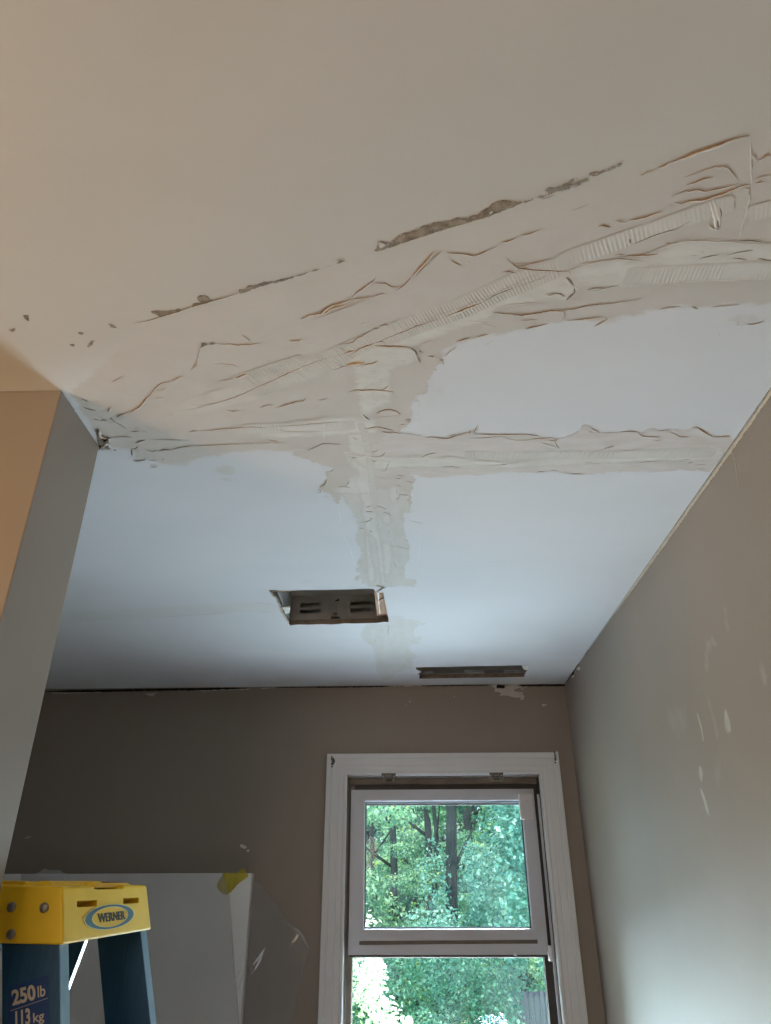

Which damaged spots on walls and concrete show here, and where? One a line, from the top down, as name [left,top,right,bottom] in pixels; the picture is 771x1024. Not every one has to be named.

crack [545,135,771,260]
crack [81,230,771,587]